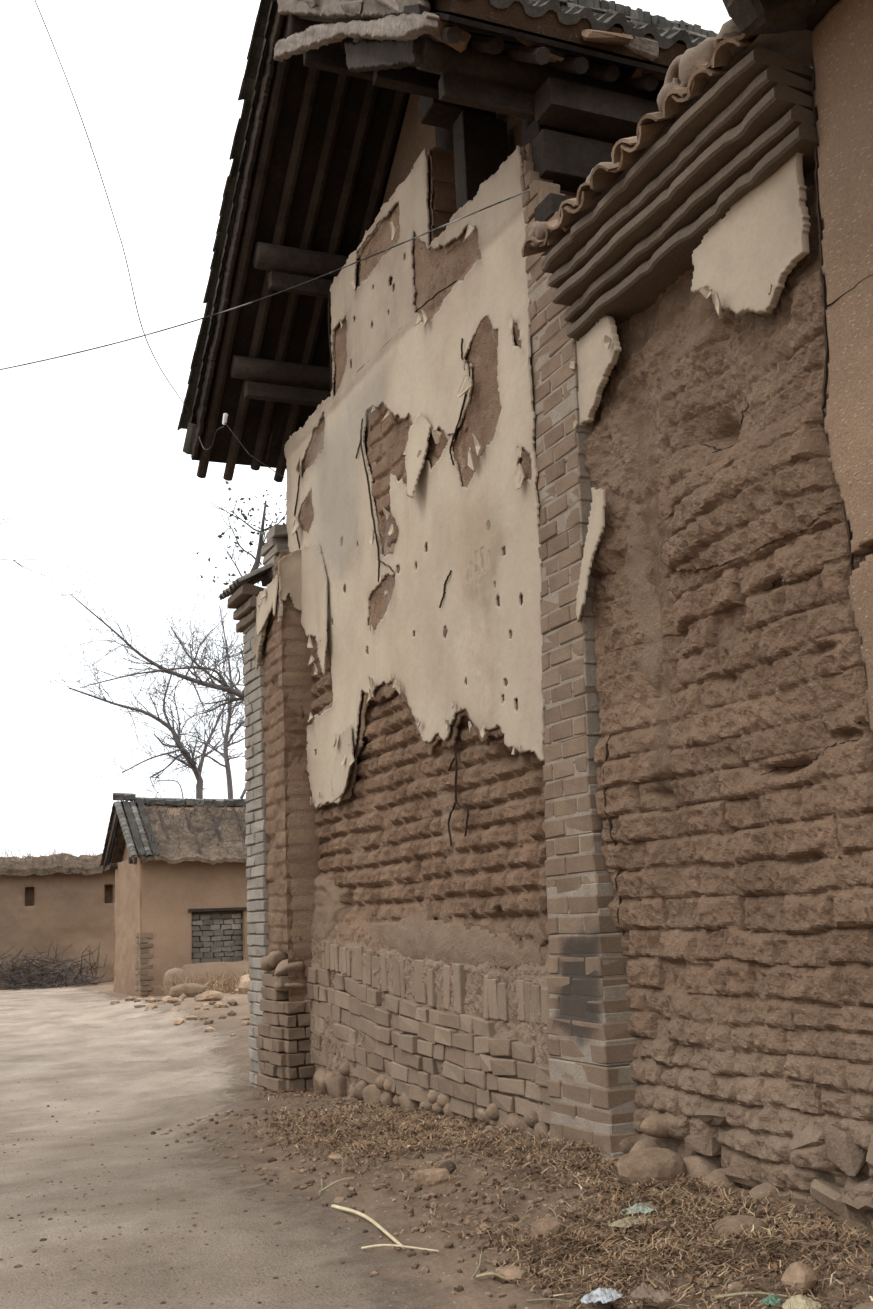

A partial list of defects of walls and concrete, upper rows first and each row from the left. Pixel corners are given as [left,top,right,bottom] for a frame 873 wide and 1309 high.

spalling [351,203,481,326]
flaking render [691,153,811,316]
crack [811,55,872,445]
flaking render [569,315,621,432]
spalling [366,314,522,630]
flaking render [576,487,606,622]
crack [843,501,873,574]
peeling [366,676,376,704]
flaking render [318,725,355,808]